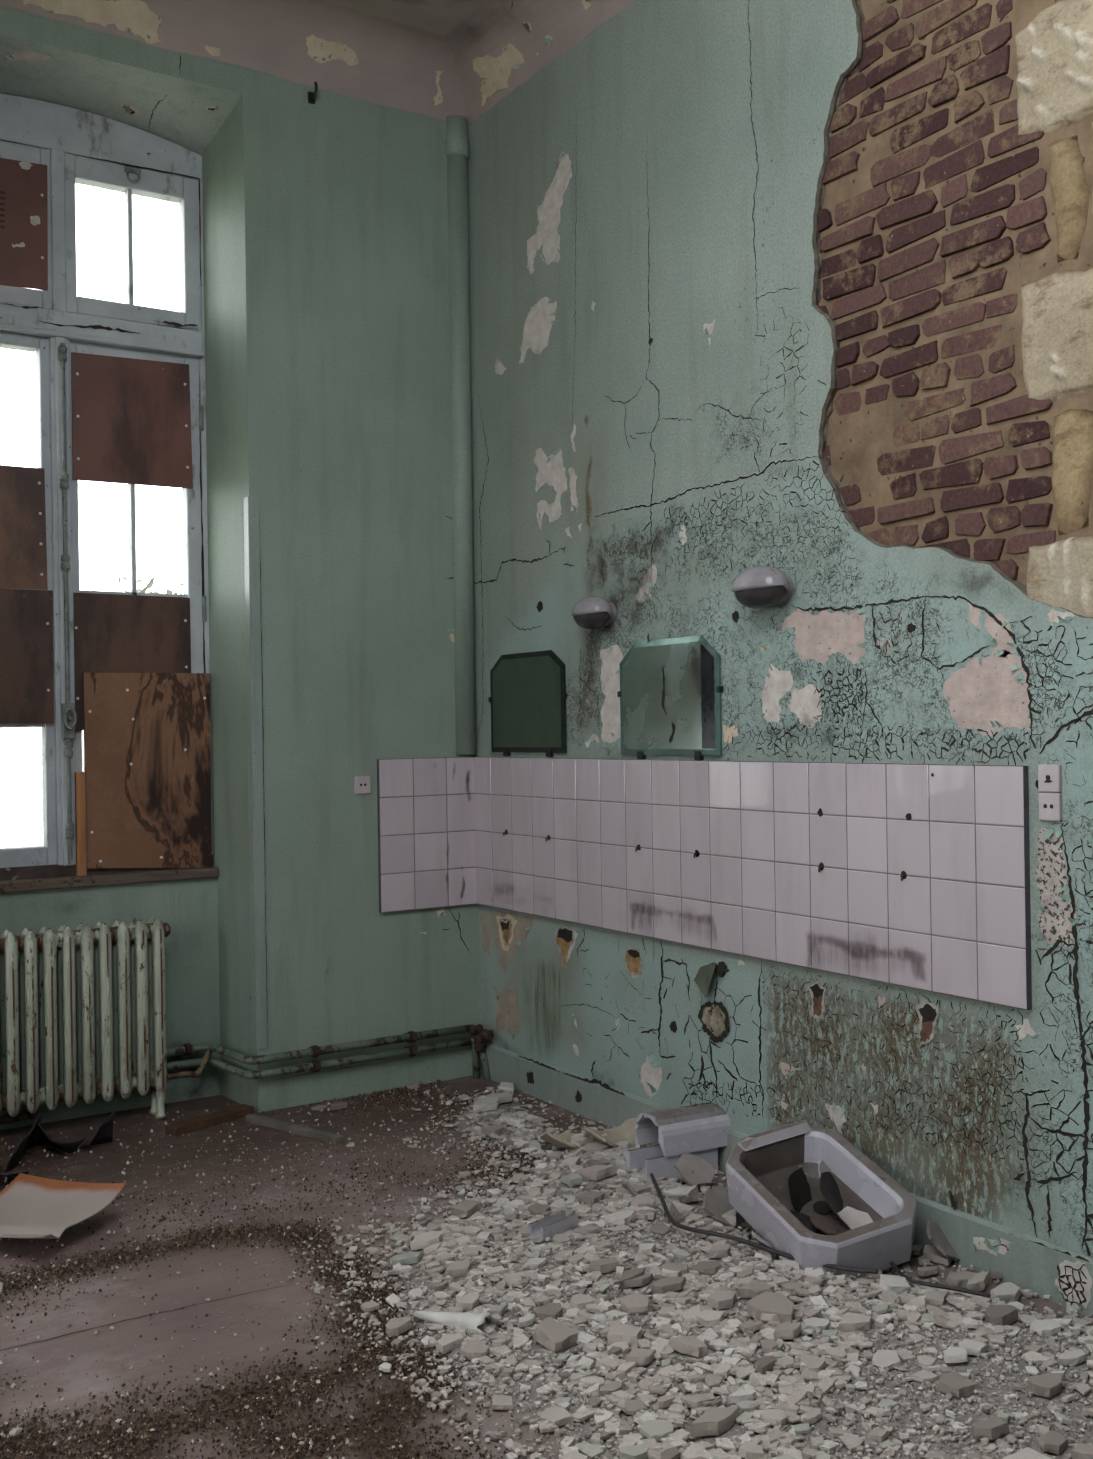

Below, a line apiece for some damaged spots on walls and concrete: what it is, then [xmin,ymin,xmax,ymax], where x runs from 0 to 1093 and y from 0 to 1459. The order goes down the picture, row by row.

peeling [23,0,161,44]
peeling [473,21,553,107]
peeling [527,152,572,274]
peeling [494,297,557,375]
flaking render [812,0,1093,625]
peeling [533,424,582,538]
crack [446,395,574,734]
crack [519,0,1093,1262]
peeling [760,605,895,729]
peeling [942,602,1031,737]
peeling [722,725,738,744]
flaking render [554,926,578,967]